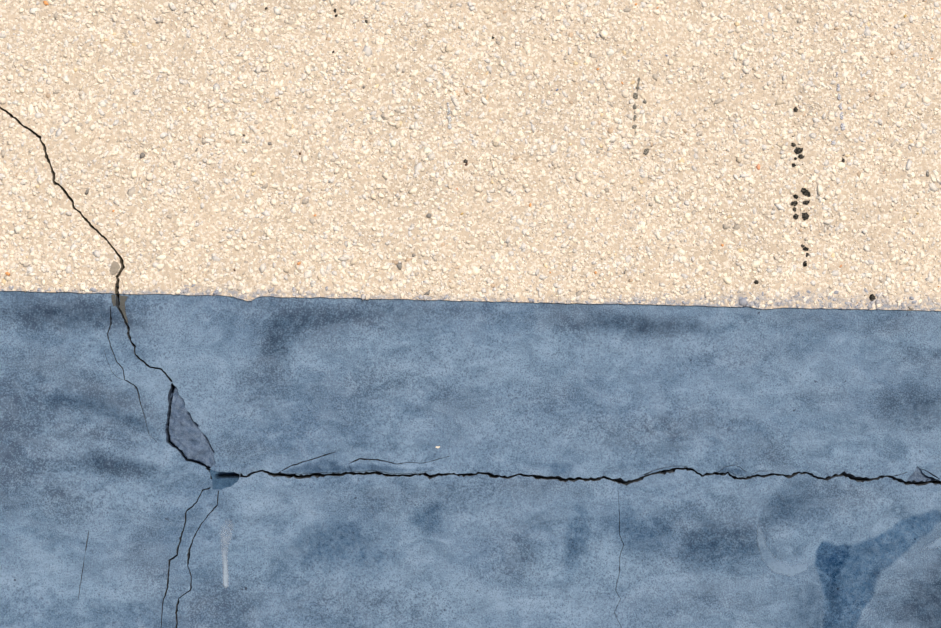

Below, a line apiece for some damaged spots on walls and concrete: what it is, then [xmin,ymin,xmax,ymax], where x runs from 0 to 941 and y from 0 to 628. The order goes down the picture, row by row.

crack [0,107,172,442]
spalling [165,383,240,490]
crack [161,467,219,628]
crack [240,452,941,628]